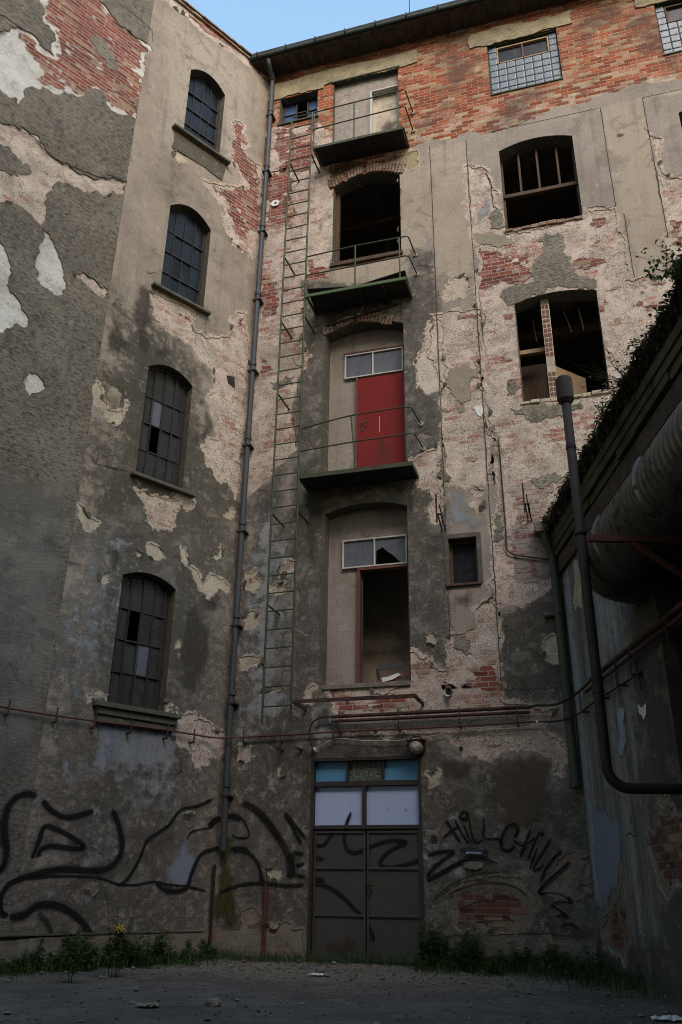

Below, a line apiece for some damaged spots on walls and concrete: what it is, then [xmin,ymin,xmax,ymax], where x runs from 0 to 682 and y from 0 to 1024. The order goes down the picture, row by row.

flaking render [0,0,153,119]
flaking render [0,121,127,298]
flaking render [0,242,29,333]
flaking render [149,118,335,520]
flaking render [91,380,130,426]
flaking render [300,132,682,780]
flaking render [132,486,196,561]
flaking render [179,543,297,601]
damp [182,600,215,690]
flaking render [164,698,252,769]
flaking render [444,849,593,937]
flaking render [645,794,682,905]